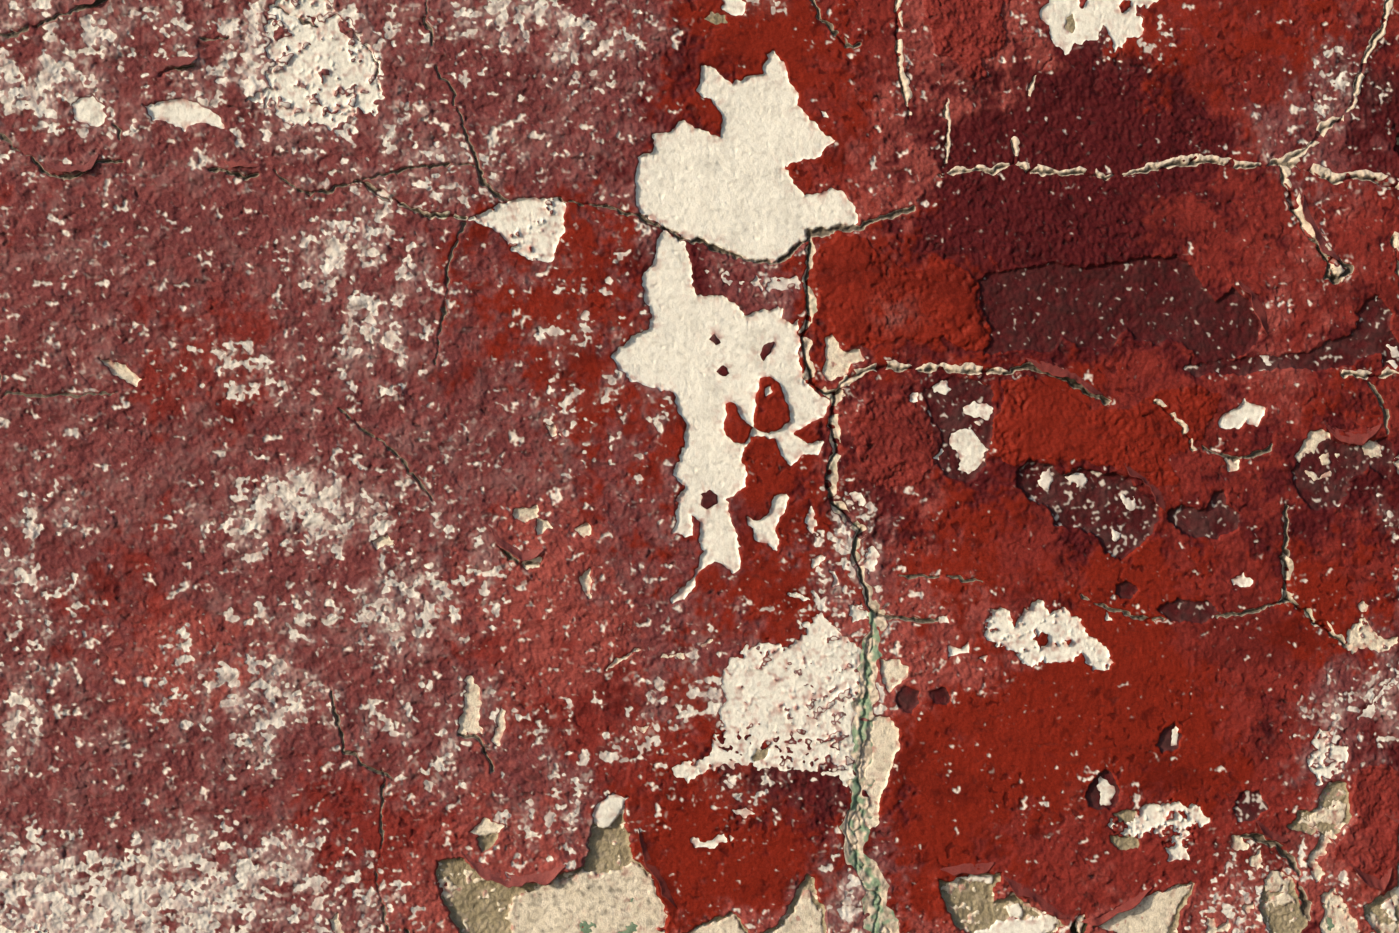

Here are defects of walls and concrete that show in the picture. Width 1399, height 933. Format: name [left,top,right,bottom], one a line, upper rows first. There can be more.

peeling [0,0,642,404]
crack [209,0,509,365]
crack [894,0,1399,285]
peeling [0,477,85,774]
peeling [0,815,426,933]
peeling [154,454,542,773]
peeling [355,676,549,792]
crack [558,197,1112,933]
peeling [436,46,1399,933]
crack [1154,399,1273,462]
crack [1215,505,1346,648]
crack [1340,367,1399,434]